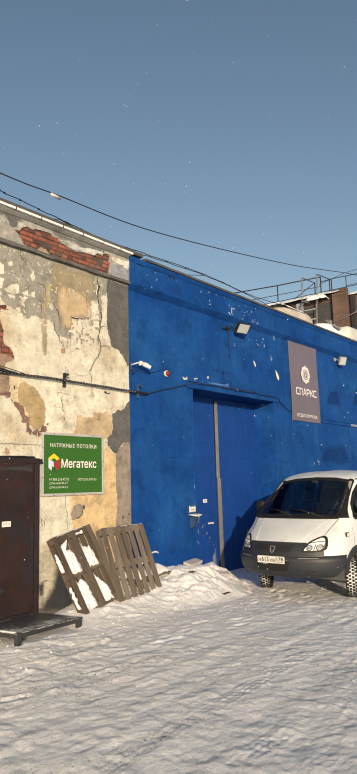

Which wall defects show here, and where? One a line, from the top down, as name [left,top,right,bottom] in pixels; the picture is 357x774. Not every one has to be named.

peeling [0,227,129,352]
crack [35,277,111,397]
flaking render [0,320,130,563]